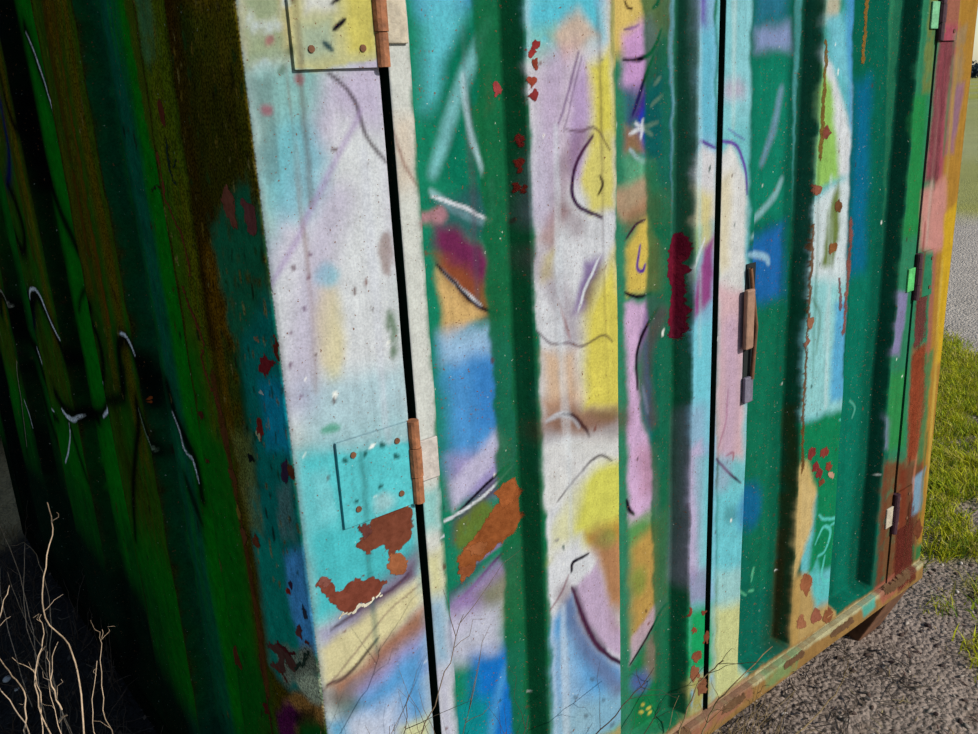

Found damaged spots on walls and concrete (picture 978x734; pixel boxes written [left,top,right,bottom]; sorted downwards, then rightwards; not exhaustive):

peeling [315,505,414,619]
corrosion [800,574,812,597]
corrosion [797,607,854,637]
peeling [266,604,311,683]
corrosion [687,607,709,695]
corrosion [784,650,805,670]
corrosion [722,692,746,714]